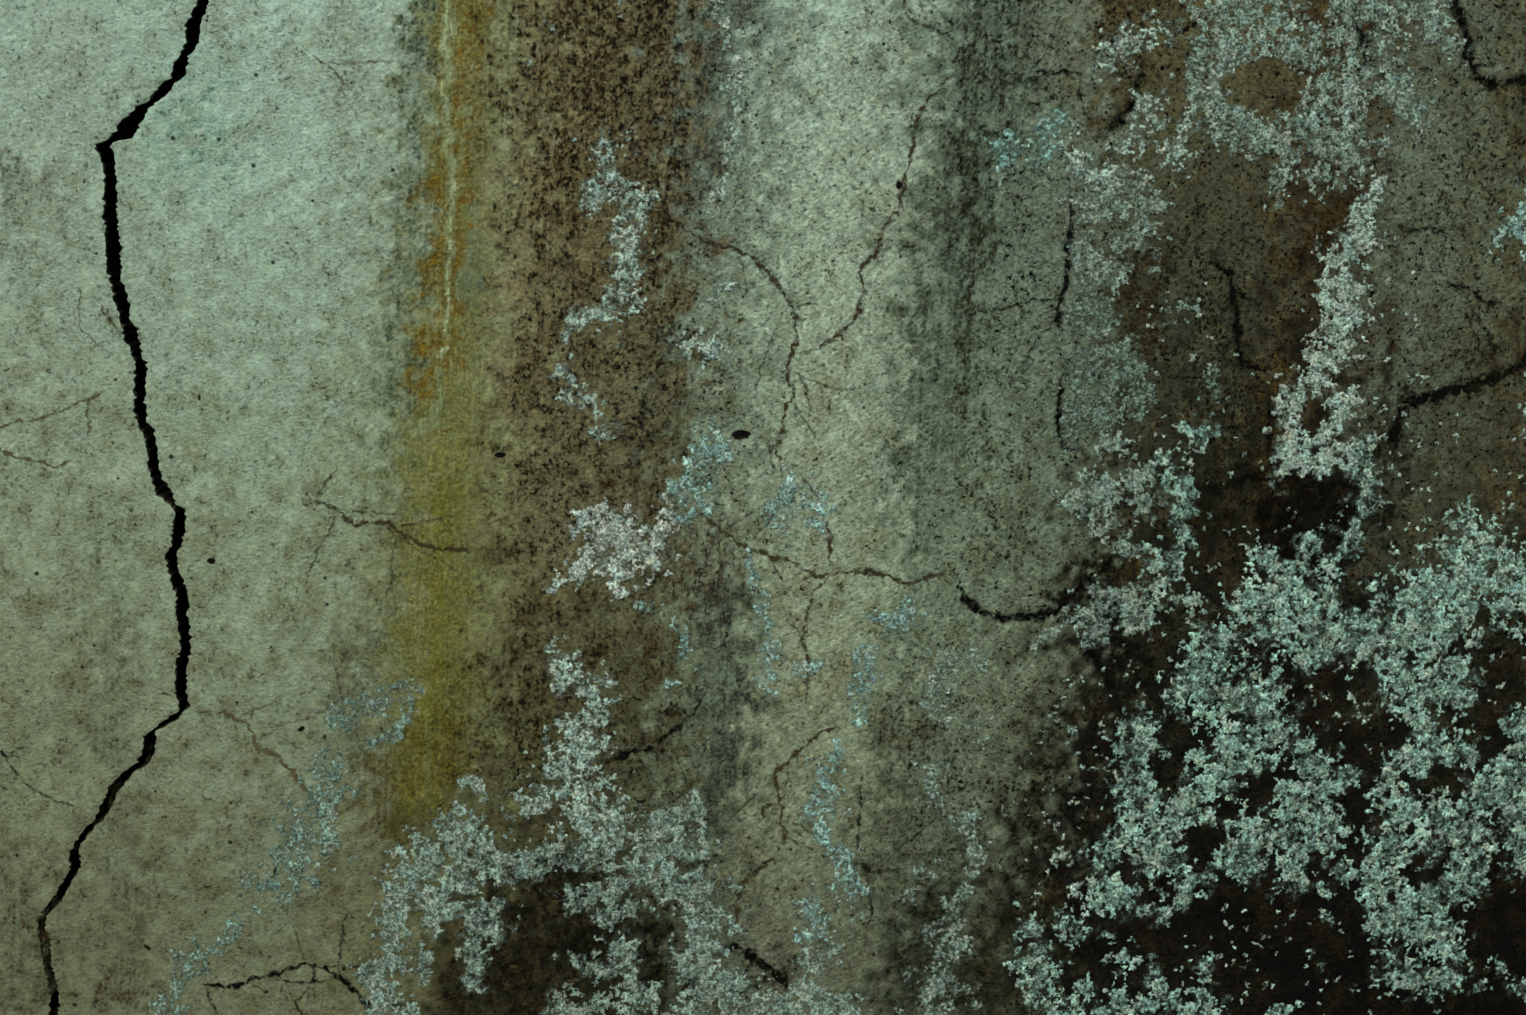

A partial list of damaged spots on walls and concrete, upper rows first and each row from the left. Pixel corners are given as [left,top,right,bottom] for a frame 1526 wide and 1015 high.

crack [1351,15,1371,66]
crack [1450,0,1526,90]
crack [0,0,341,1015]
rust [353,0,722,840]
leakage [431,838,679,1015]
leakage [447,643,665,807]
leakage [435,0,751,588]
leakage [894,0,1065,570]
leakage [871,558,1526,1015]
crack [1196,407,1281,496]
leakage [1132,180,1410,638]
crack [1389,283,1526,451]